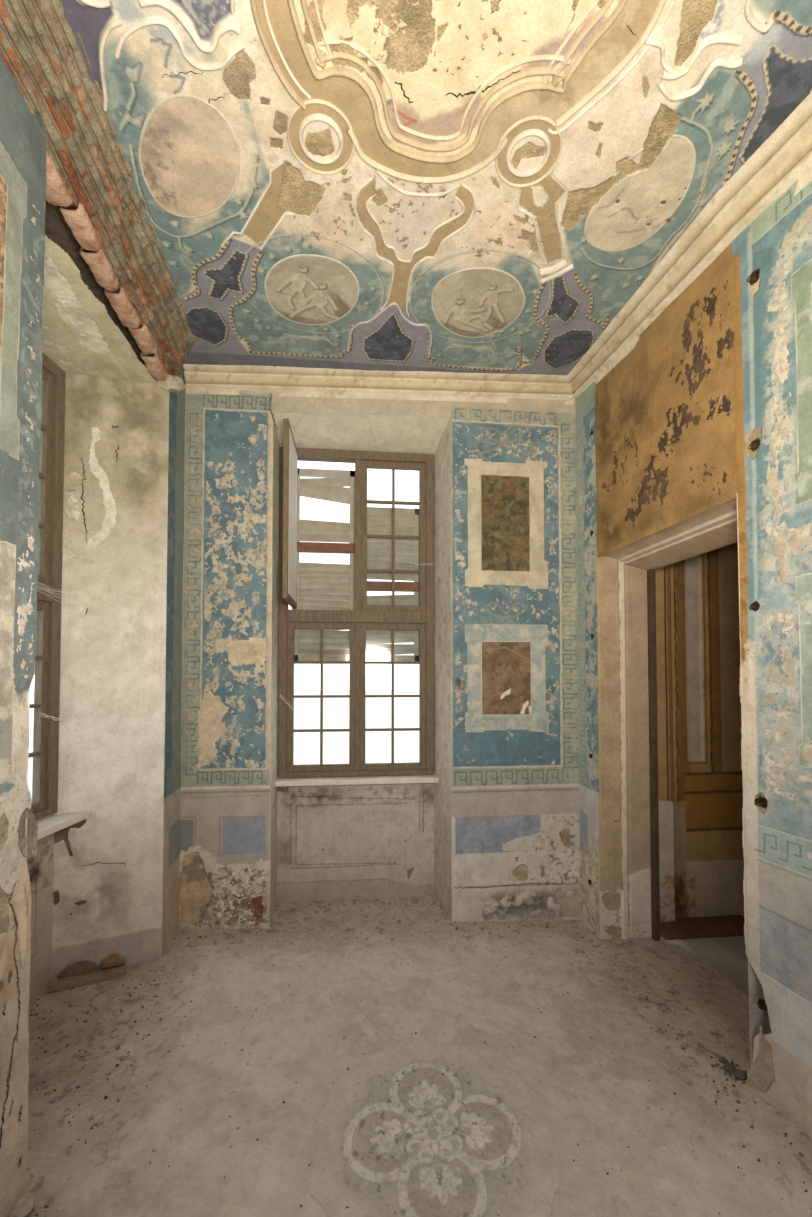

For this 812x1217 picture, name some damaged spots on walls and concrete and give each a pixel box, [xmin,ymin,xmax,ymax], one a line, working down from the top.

spalling [217,37,288,149]
crack [395,82,413,103]
spalling [303,0,514,86]
crack [445,70,521,98]
spalling [269,103,683,257]
peeling [17,522,35,679]
peeling [185,411,268,778]
peeling [454,424,560,739]
peeling [576,280,734,780]
spalling [0,808,38,857]
spalling [179,851,270,928]
crack [0,879,22,1167]